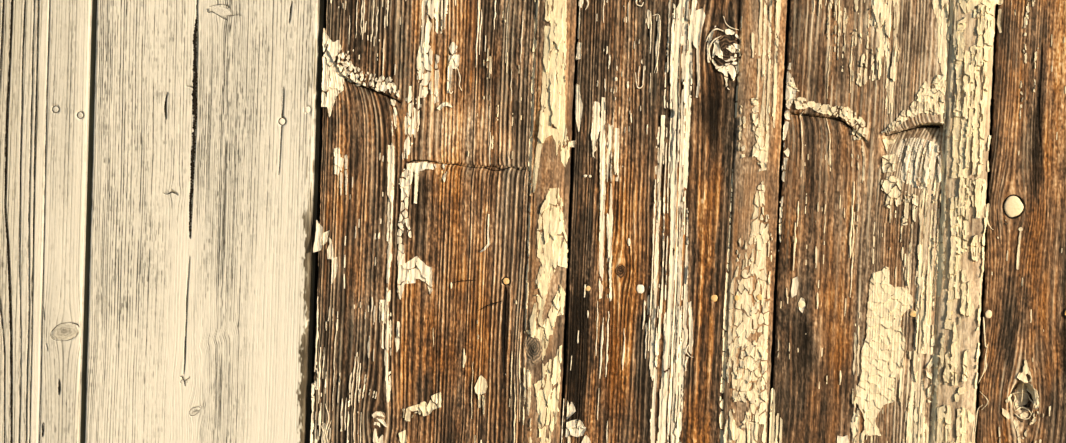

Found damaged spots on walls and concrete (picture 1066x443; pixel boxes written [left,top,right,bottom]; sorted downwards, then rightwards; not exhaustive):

crack [164,0,234,384]
peeling [310,0,462,443]
crack [408,160,527,171]
peeling [475,376,487,414]
peeling [506,0,868,443]
peeling [818,0,1065,443]